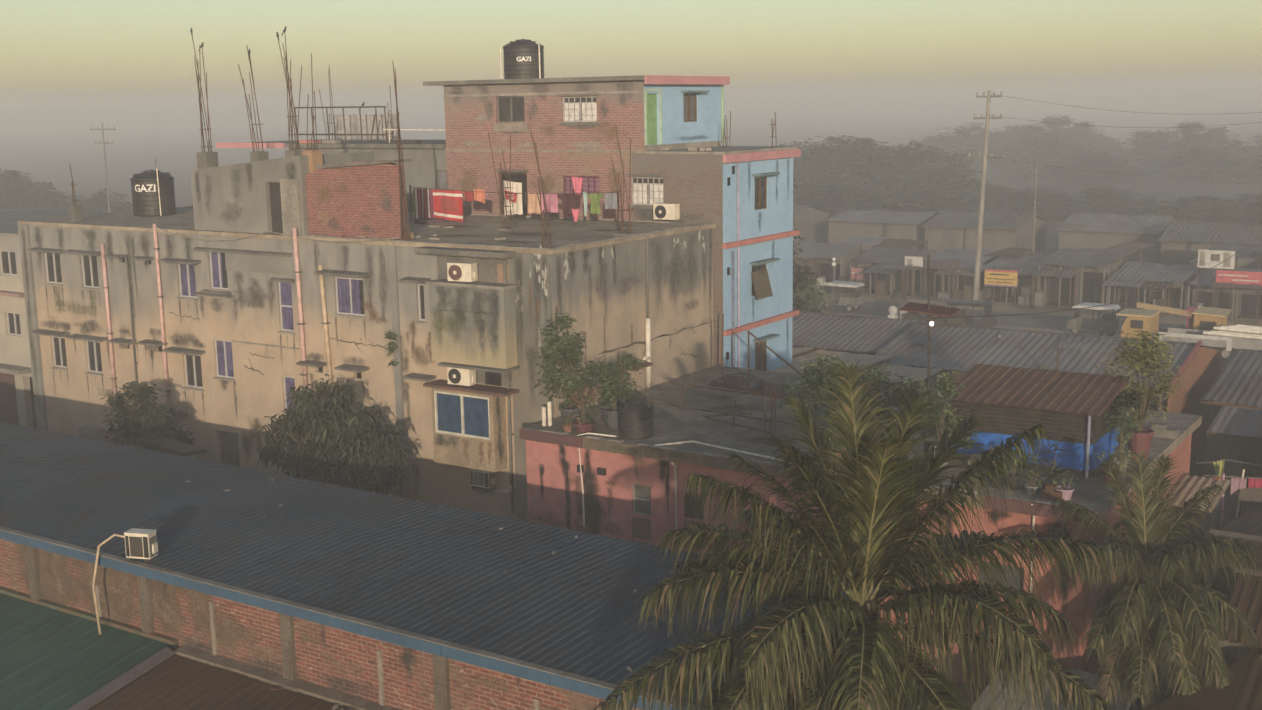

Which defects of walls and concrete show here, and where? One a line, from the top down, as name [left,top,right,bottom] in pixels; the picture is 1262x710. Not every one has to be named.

leakage [401,288,497,415]
leakage [516,247,633,377]
crack [576,322,709,372]
leakage [538,445,614,534]